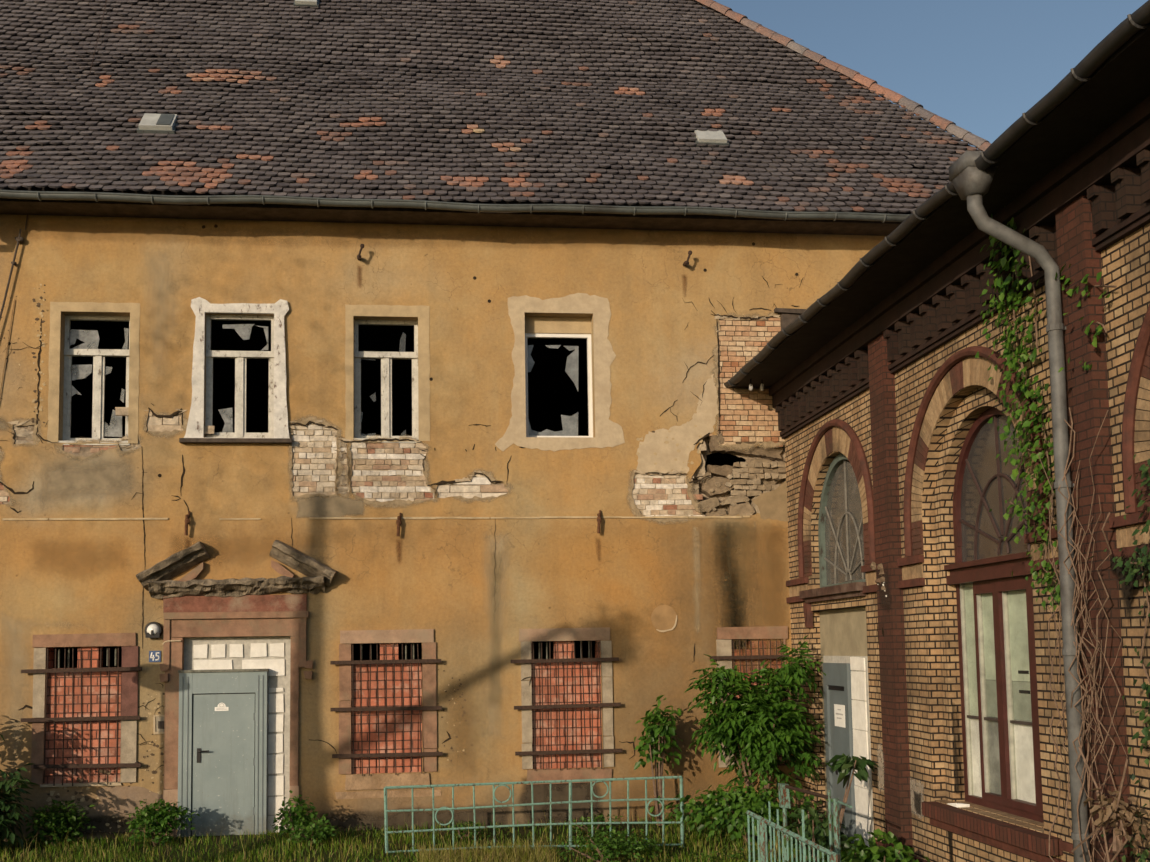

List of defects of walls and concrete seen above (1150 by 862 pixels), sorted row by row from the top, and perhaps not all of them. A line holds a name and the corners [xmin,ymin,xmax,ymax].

crack [0,481,34,513]
flaking render [0,284,46,505]
crack [0,319,57,443]
flaking render [115,407,129,416]
flaking render [56,409,188,462]
crack [131,450,147,560]
crack [148,403,183,425]
crack [171,455,189,511]
flaking render [288,416,512,508]
flaking render [627,312,786,523]
crack [660,276,804,445]
water stain [719,526,748,645]